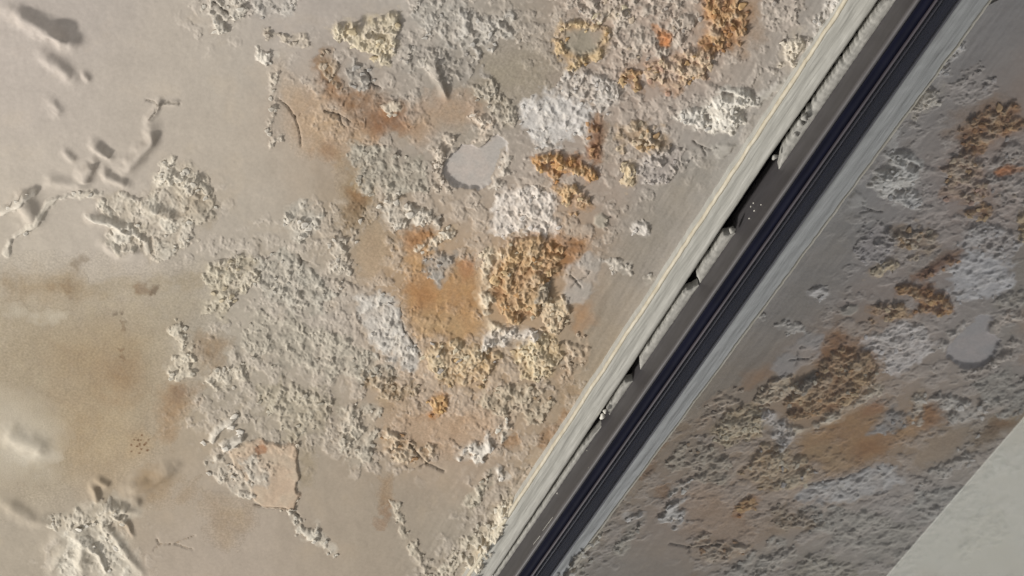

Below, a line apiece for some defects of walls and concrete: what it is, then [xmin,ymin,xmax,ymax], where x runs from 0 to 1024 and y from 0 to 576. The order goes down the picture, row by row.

peeling [549,0,705,63]
rust [618,0,769,99]
rust [270,51,403,237]
peeling [553,68,689,195]
peeling [0,154,222,267]
peeling [161,0,592,559]
rust [391,116,607,345]
peeling [607,255,660,287]
peeling [628,216,652,239]
peeling [41,489,153,576]
peeling [388,499,438,576]